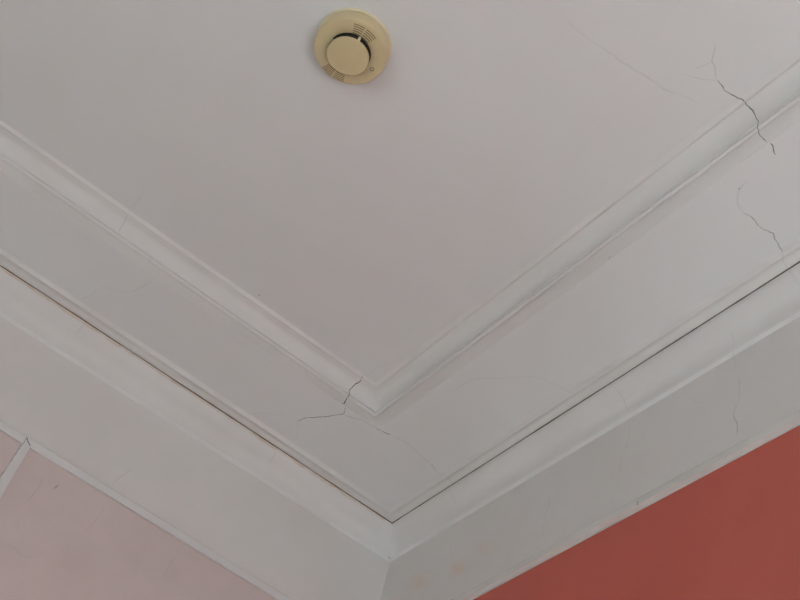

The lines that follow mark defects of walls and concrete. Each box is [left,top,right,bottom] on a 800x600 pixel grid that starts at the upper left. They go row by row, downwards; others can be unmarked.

crack [718,81,776,155]
crack [0,261,800,524]